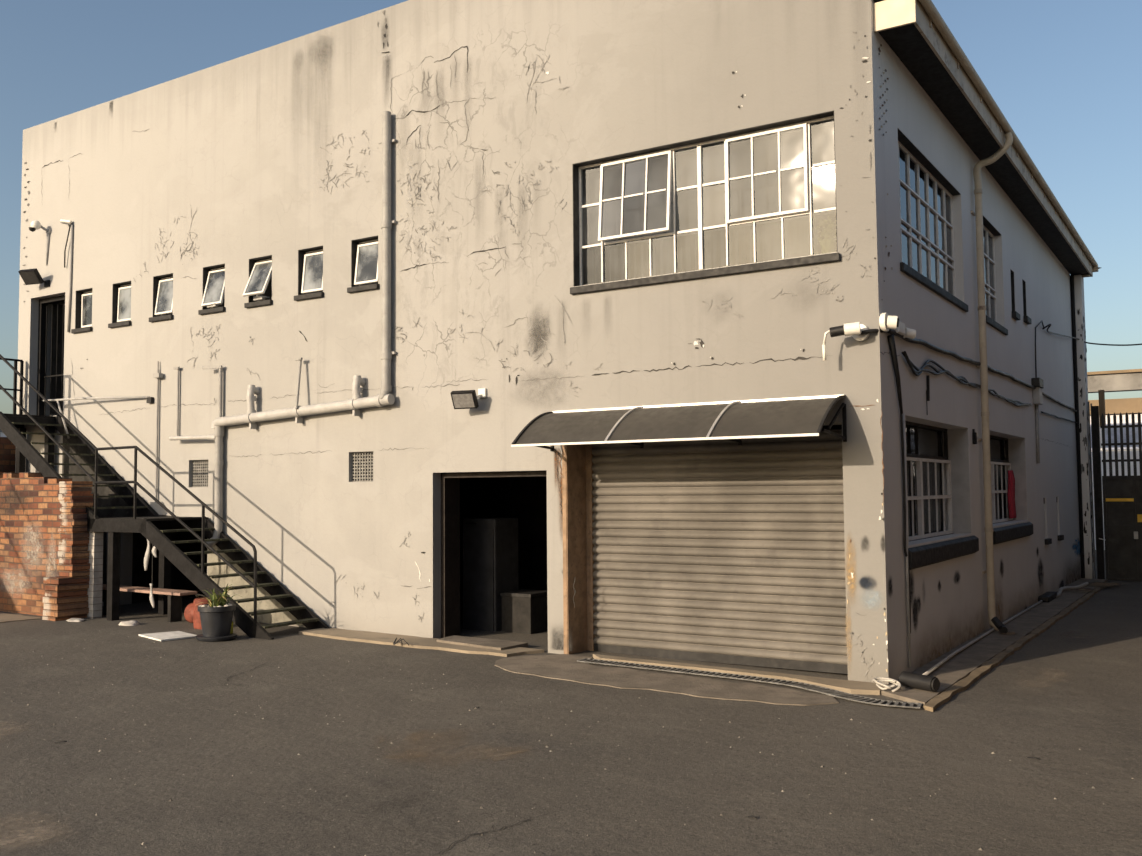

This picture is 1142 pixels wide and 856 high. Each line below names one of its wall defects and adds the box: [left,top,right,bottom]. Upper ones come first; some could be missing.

crack [390,46,495,200]
crack [400,243,521,275]
crack [522,355,829,381]
leakage [910,574,918,628]
peeling [848,608,888,682]